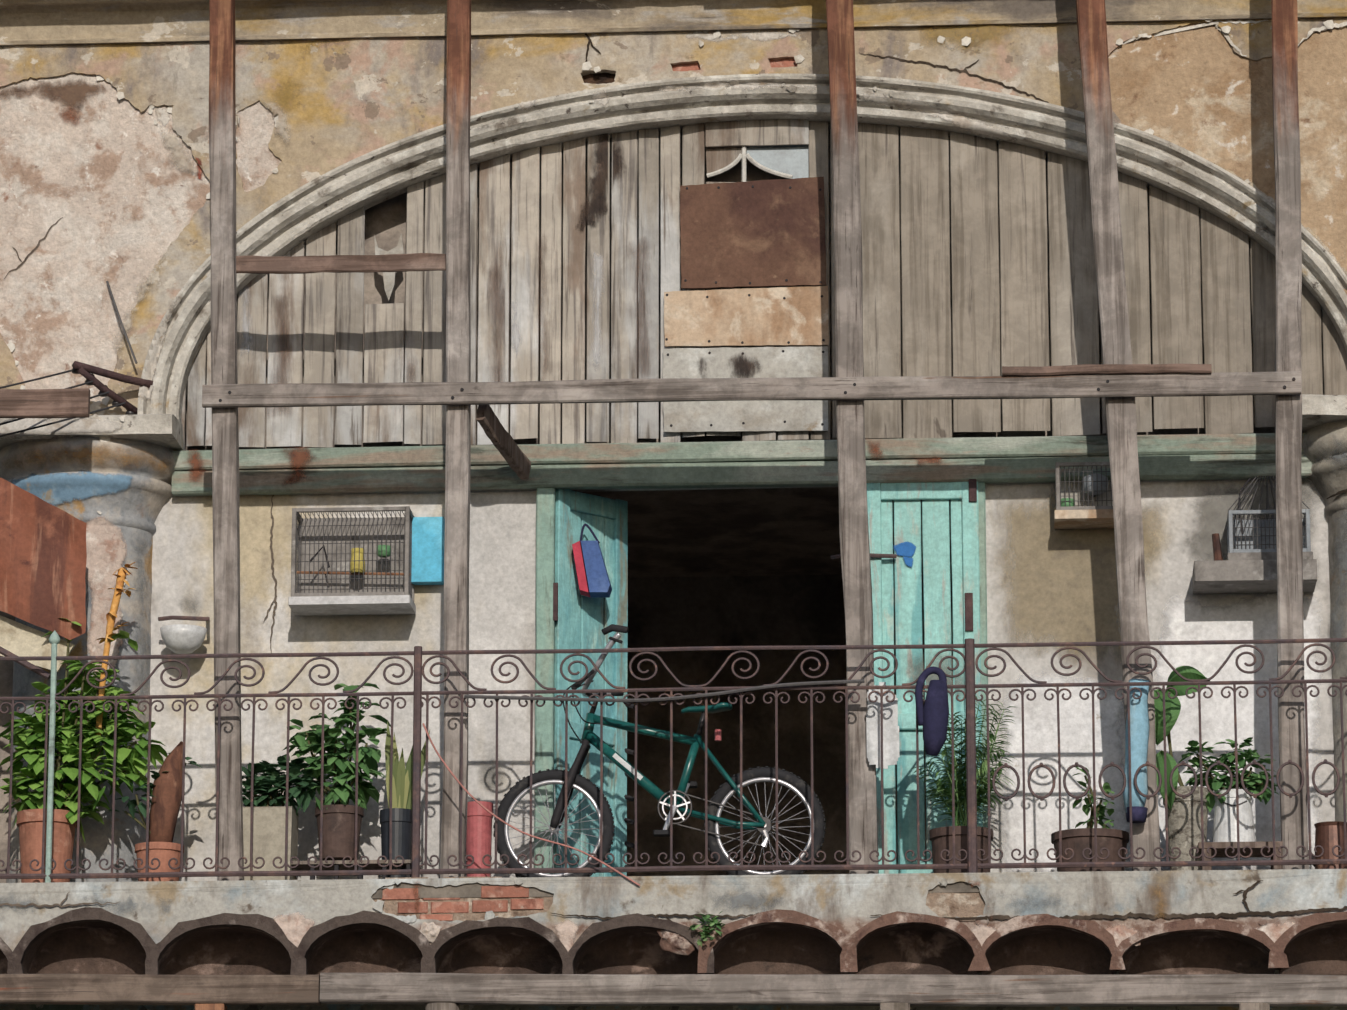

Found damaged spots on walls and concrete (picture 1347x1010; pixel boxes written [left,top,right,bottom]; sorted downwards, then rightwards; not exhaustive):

crack [1120,20,1268,56]
crack [1298,22,1347,46]
crack [860,53,1049,103]
flaking render [236,101,288,192]
damp [580,133,624,230]
crack [4,217,63,279]
flaking render [0,73,210,442]
crack [1327,489,1347,499]
crack [263,495,277,653]
flaking render [372,877,553,923]
flaking render [551,920,578,951]
spalling [926,878,998,946]